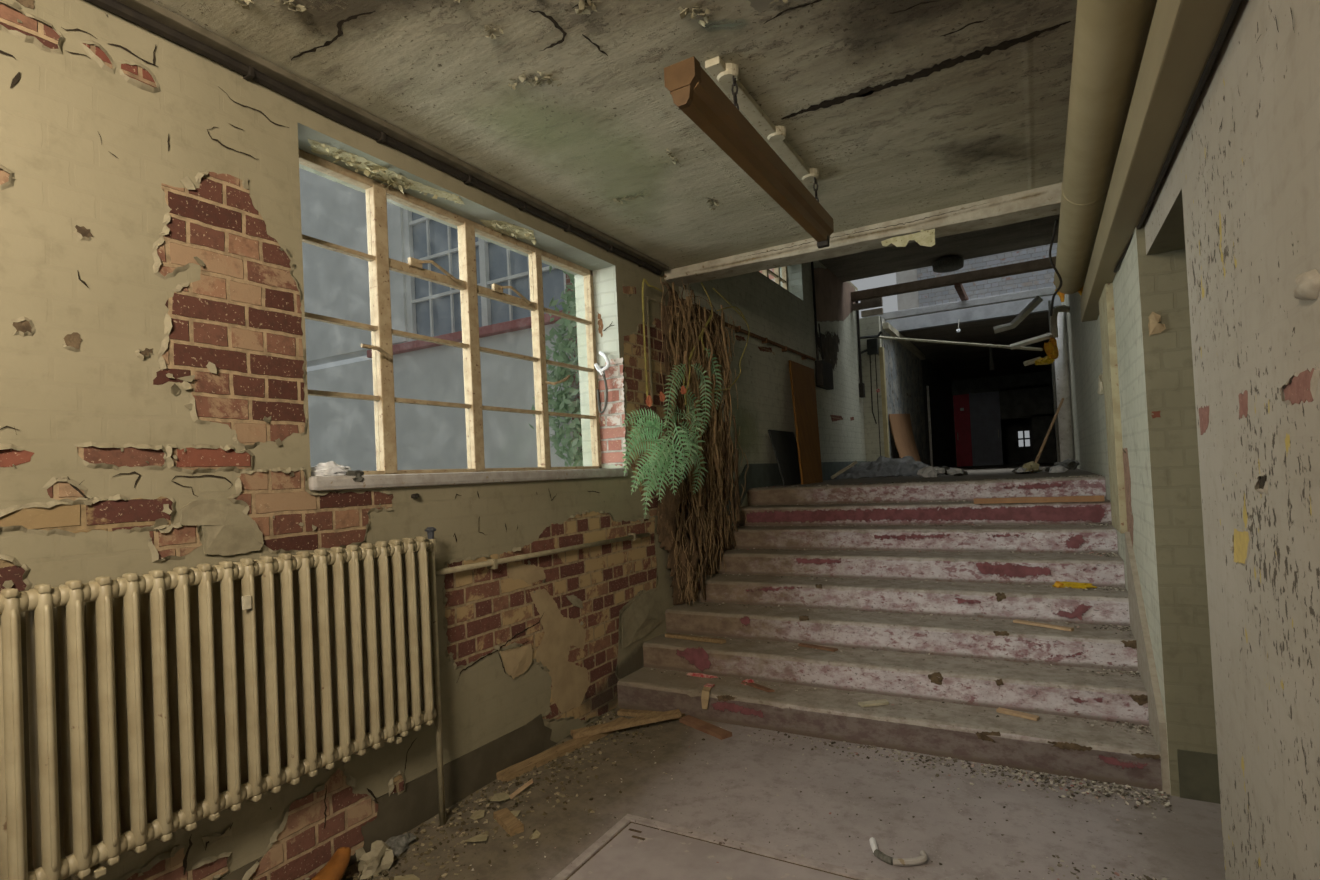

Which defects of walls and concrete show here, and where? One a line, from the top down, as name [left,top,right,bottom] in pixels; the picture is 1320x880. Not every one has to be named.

flaking render [0,0,161,93]
crack [291,11,376,60]
crack [764,0,822,24]
crack [781,19,1071,120]
flaking render [0,169,394,564]
flaking render [1199,405,1209,435]
flaking render [1238,390,1248,418]
flaking render [1280,366,1320,408]
flaking render [442,318,671,727]
flaking render [0,554,32,592]
flaking render [242,762,406,880]
flaking render [119,844,232,880]